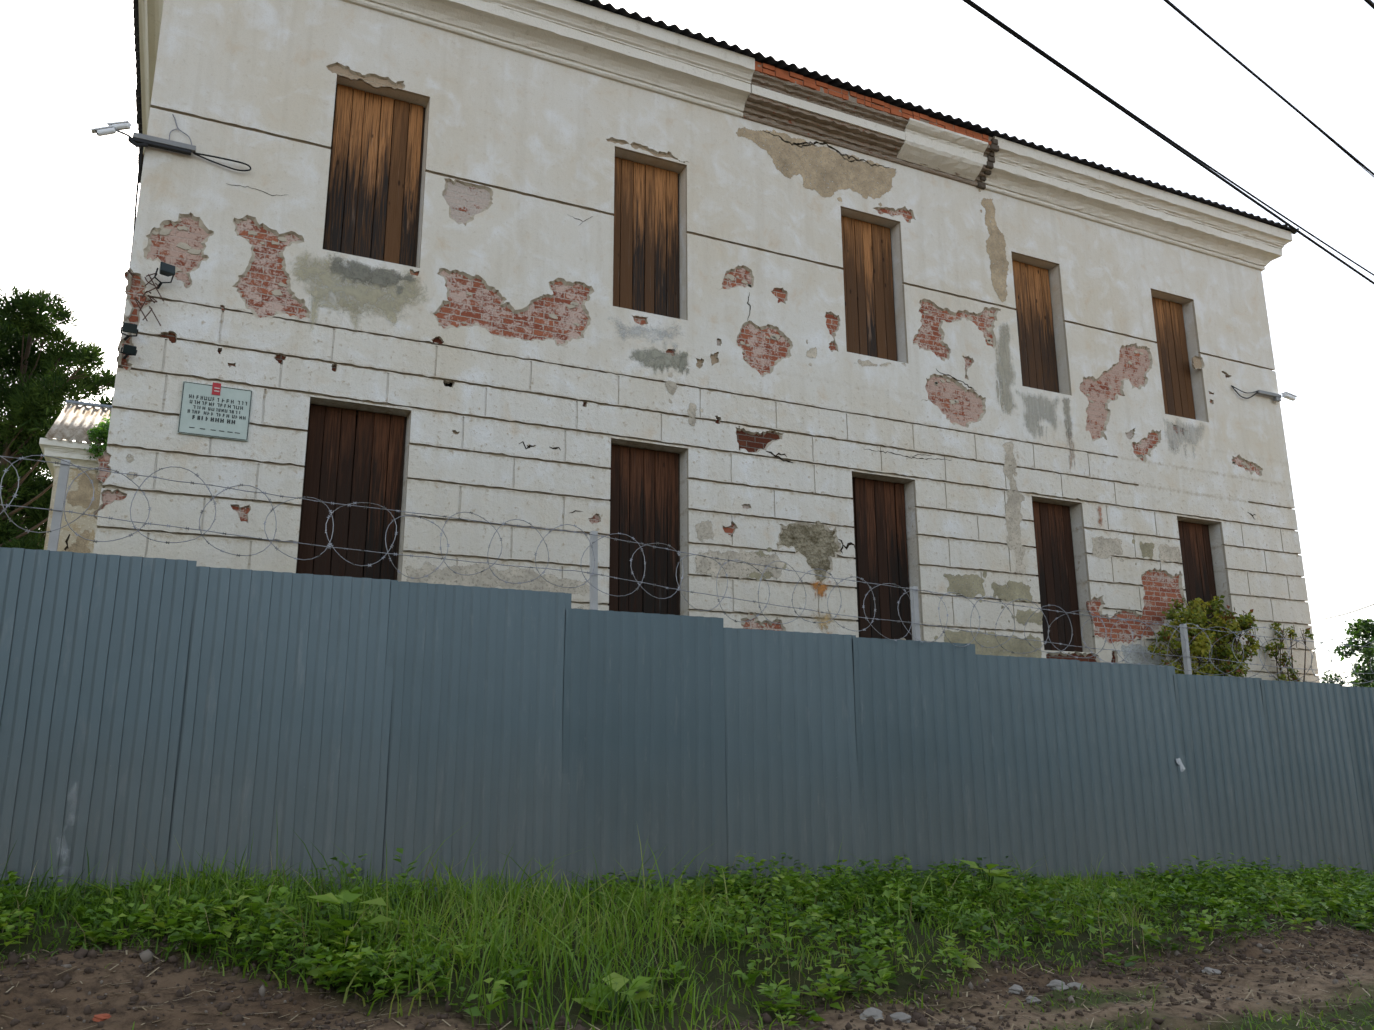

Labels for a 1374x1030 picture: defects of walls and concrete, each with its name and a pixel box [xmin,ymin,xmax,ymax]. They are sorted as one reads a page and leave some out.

spalling [442,178,493,226]
peeling [736,127,915,223]
spalling [116,212,214,371]
spalling [232,215,311,320]
water stain [294,256,419,325]
spalling [432,268,594,346]
spalling [665,349,783,453]
spalling [696,311,840,377]
spalling [913,189,1009,428]
spalling [1079,343,1152,441]
spalling [1125,424,1187,462]
spalling [900,441,1188,663]